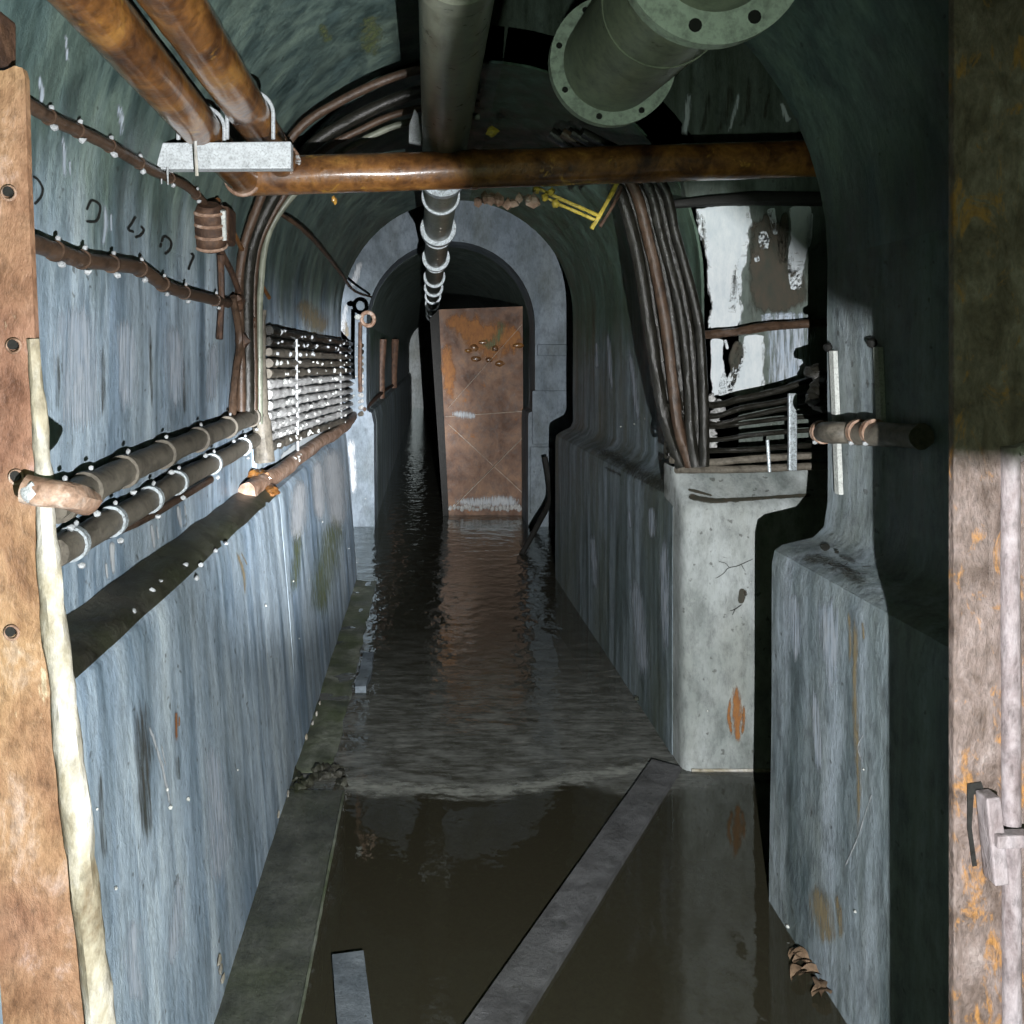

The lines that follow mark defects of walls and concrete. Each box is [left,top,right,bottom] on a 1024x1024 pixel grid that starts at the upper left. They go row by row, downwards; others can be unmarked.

rust [441,345,456,398]
rust [446,315,521,359]
peeling [696,206,813,398]
water stain [137,704,180,837]
rust [727,688,745,739]
rust [848,617,865,817]